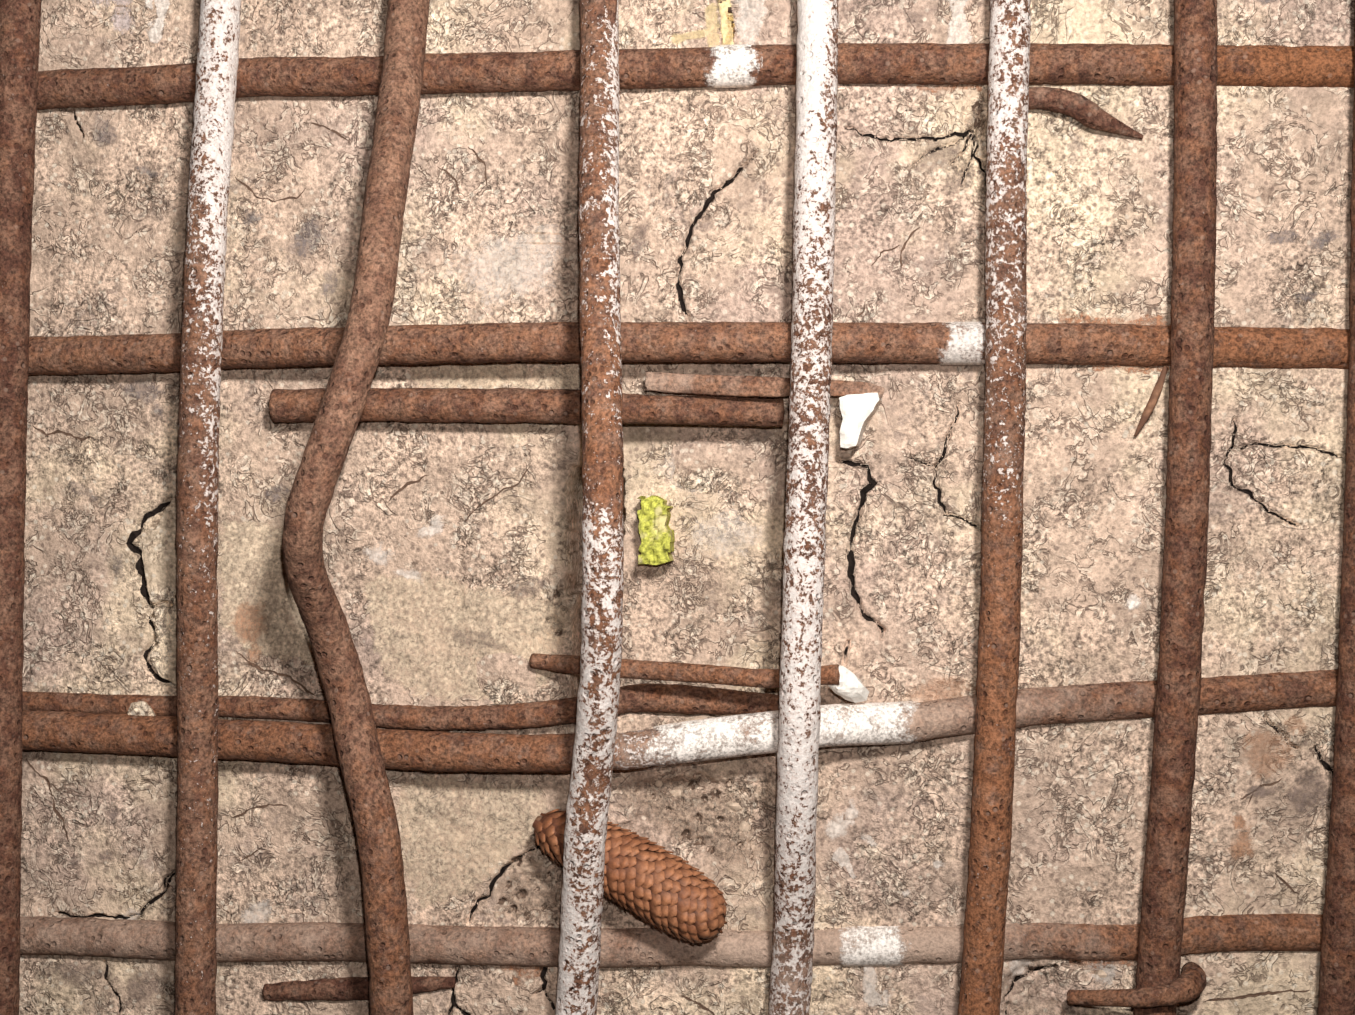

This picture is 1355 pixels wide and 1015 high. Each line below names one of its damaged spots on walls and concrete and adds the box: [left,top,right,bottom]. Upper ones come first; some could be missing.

crack [676,153,758,320]
crack [845,126,986,193]
crack [126,501,177,686]
spalling [0,0,792,1015]
crack [841,460,883,663]
crack [911,406,982,532]
spalling [613,0,1355,1015]
crack [1222,421,1342,525]